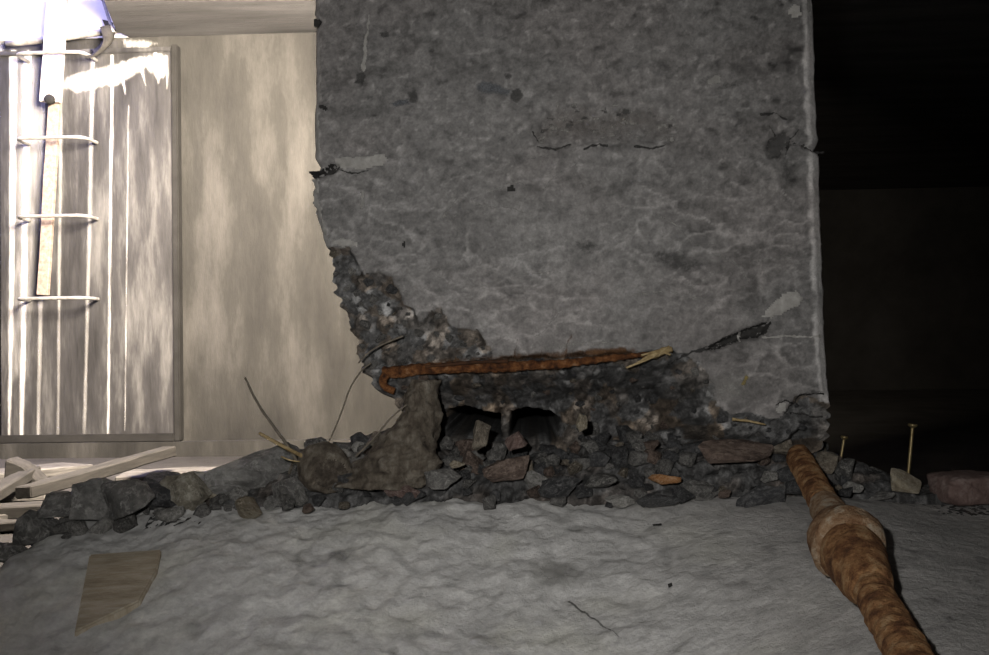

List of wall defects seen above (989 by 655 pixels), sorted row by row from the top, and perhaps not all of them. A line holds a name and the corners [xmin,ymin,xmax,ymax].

corrosion [425,340,630,368]
spalling [309,154,831,457]